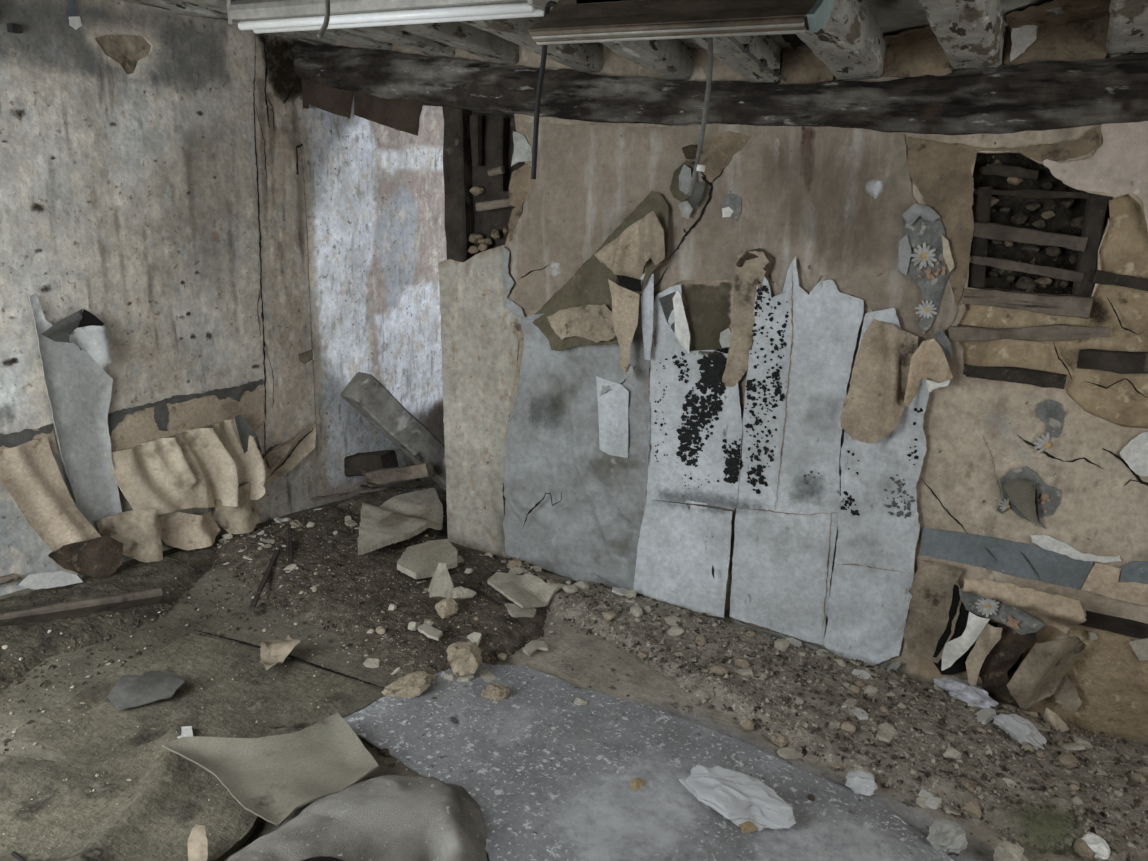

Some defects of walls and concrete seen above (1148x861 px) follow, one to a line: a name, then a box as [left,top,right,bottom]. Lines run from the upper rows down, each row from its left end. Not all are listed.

flaking render [95,35,151,74]
flaking render [695,131,751,184]
flaking render [907,126,1102,306]
peeling [546,304,616,343]
peeling [596,376,629,458]
water stain [654,281,789,507]
peeling [840,319,919,444]
crack [1016,434,1148,486]
peeling [0,436,101,551]
water stain [837,490,860,516]
water stain [884,474,915,519]
crack [920,478,967,533]